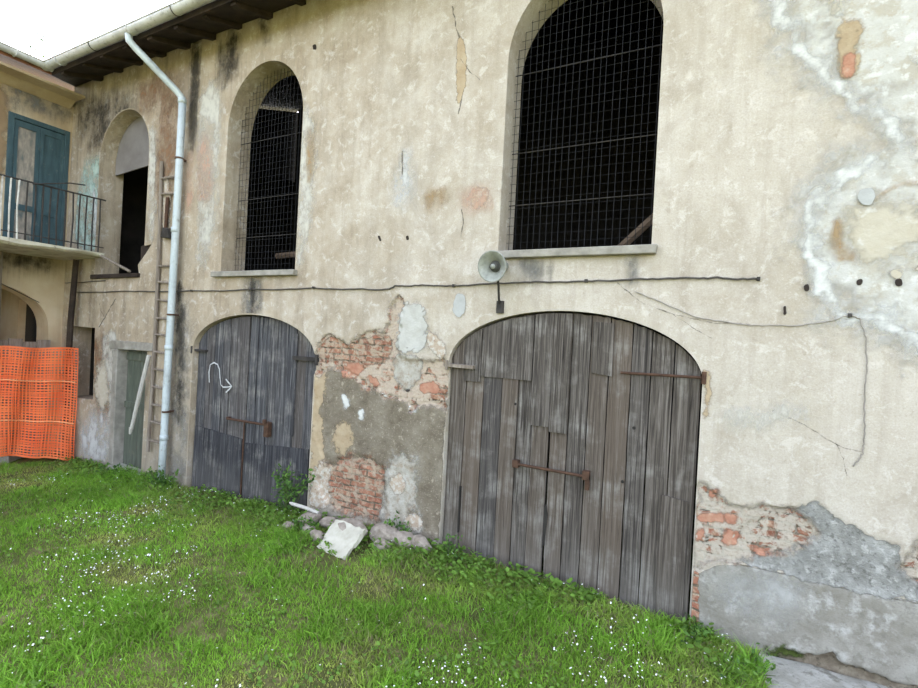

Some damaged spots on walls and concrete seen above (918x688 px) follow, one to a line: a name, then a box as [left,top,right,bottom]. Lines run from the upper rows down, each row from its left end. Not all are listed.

damp [0,88,9,178]
peeling [768,0,918,361]
flaking render [308,295,449,542]
flaking render [691,482,819,624]
flaking render [765,644,918,688]